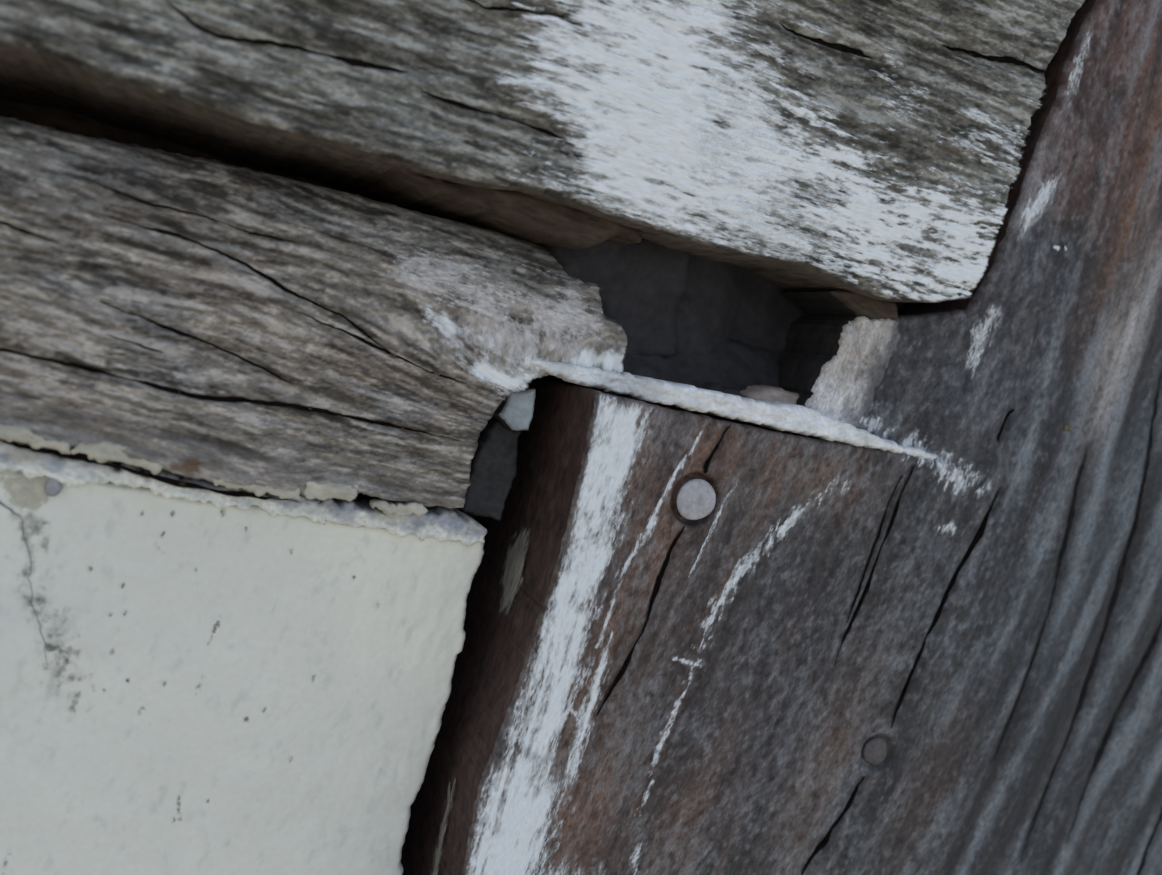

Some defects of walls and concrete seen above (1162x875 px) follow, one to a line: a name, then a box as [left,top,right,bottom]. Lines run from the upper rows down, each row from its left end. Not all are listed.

crack [84,177,467,384]
spalling [4,476,48,510]
peeling [0,424,163,475]
peeling [206,471,358,502]
peeling [370,499,428,517]
crack [704,424,732,473]
crack [998,409,1015,442]
crack [0,502,48,666]
crack [597,526,685,716]
crack [834,465,914,666]
crack [891,487,1002,728]
crack [801,776,865,875]